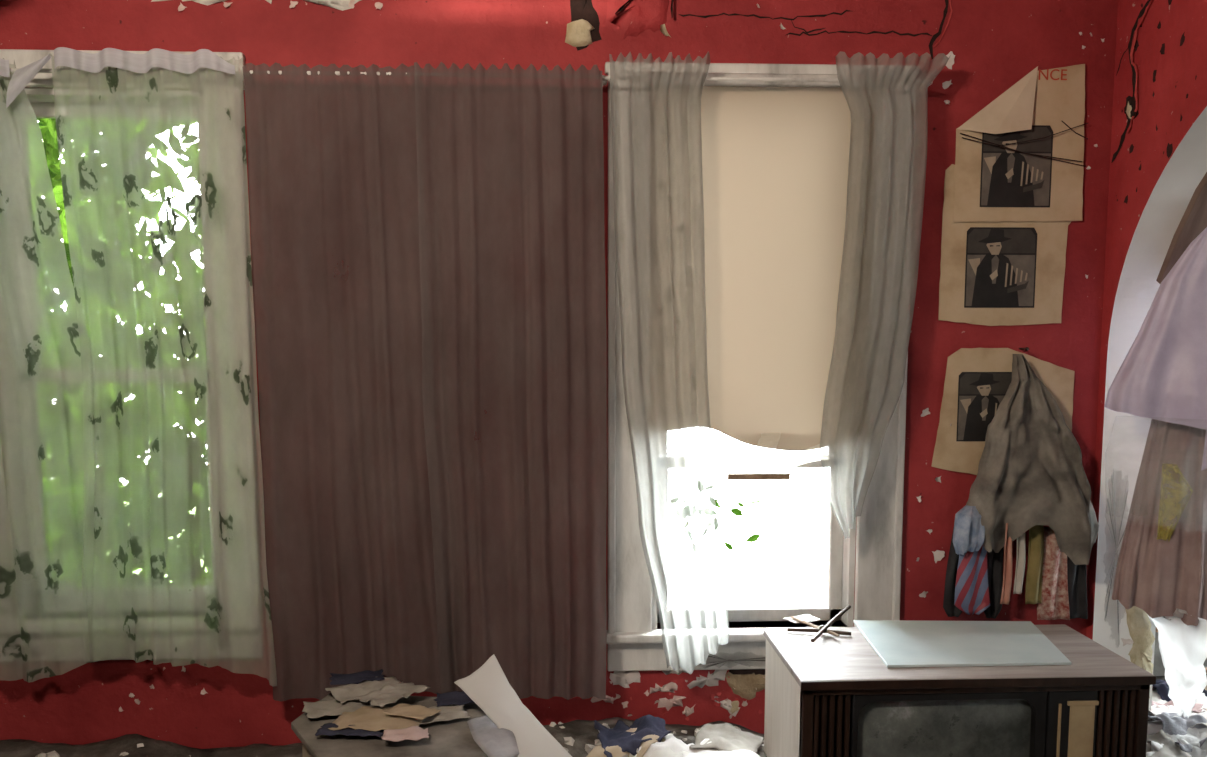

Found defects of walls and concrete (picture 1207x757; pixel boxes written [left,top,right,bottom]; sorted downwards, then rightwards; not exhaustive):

flaking render [151,0,233,11]
flaking render [289,0,383,11]
crack [679,0,953,59]
crack [1112,0,1153,162]
peeling [591,669,765,721]